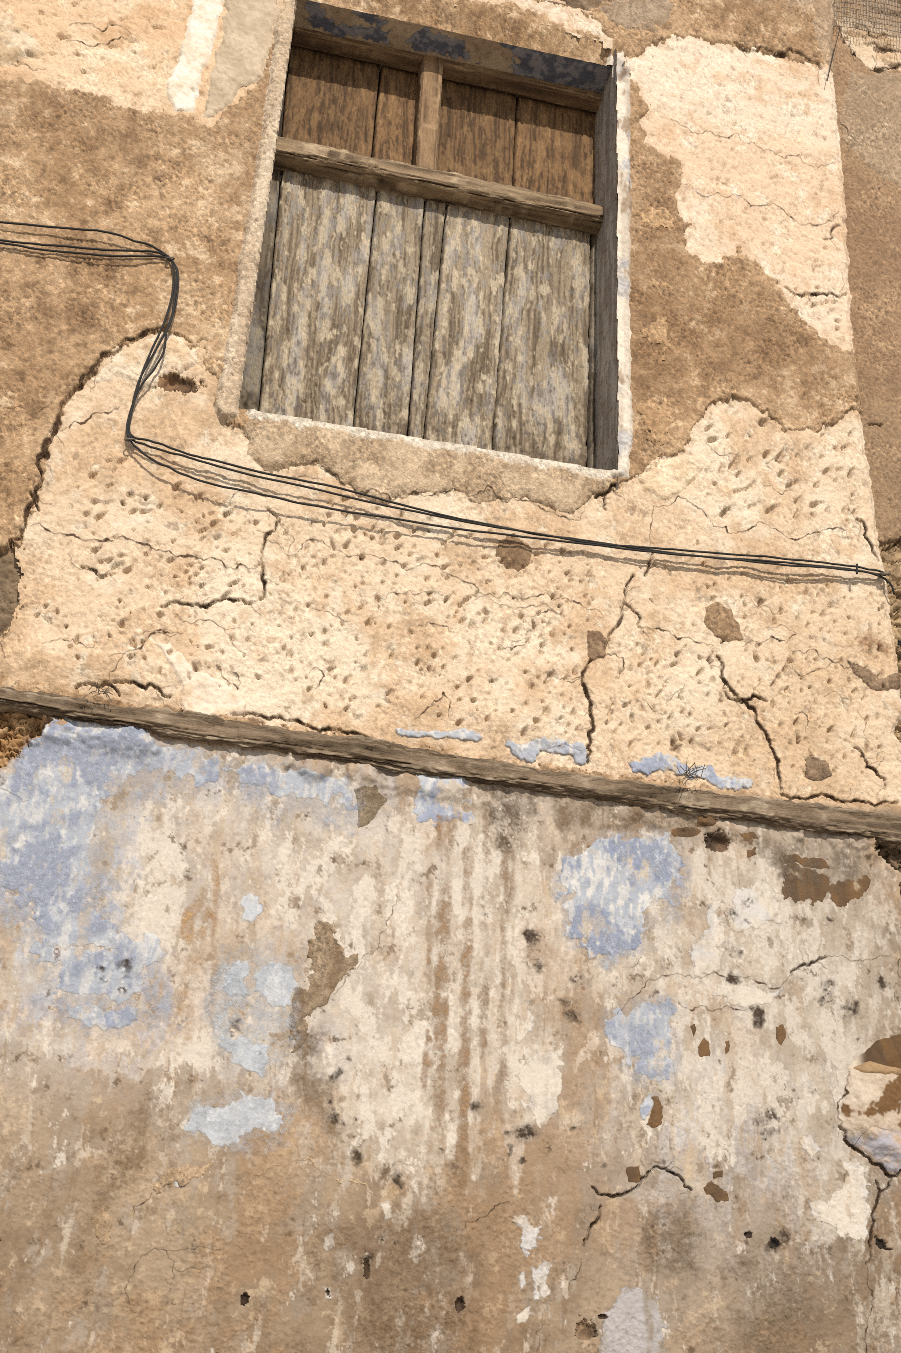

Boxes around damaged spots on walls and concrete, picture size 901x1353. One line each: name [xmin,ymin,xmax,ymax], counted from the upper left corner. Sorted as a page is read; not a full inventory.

flaking render [0,0,285,128]
flaking render [304,0,855,353]
flaking render [0,332,901,805]
crack [16,328,901,807]
peeling [0,712,358,1031]
water stain [490,786,537,851]
water stain [523,929,539,943]
peeling [688,853,871,1008]
water stain [750,1006,765,1027]
water stain [506,1125,534,1164]
crack [586,1167,684,1240]
crack [837,1087,901,1353]